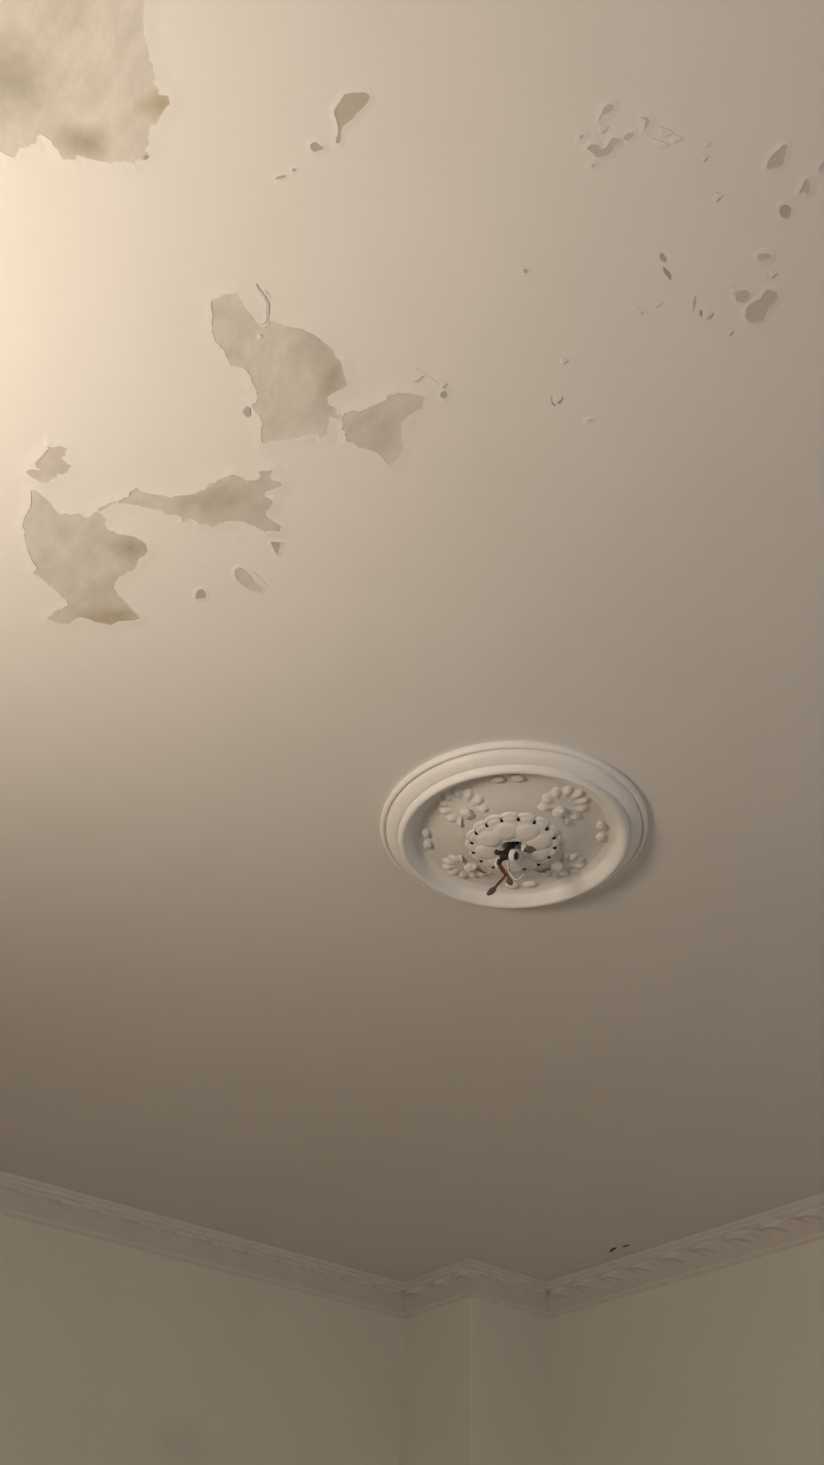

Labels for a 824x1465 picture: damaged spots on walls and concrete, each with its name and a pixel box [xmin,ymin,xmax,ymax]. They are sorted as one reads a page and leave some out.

peeling [0,0,186,180]
peeling [304,84,377,159]
peeling [729,283,784,328]
peeling [11,280,453,633]